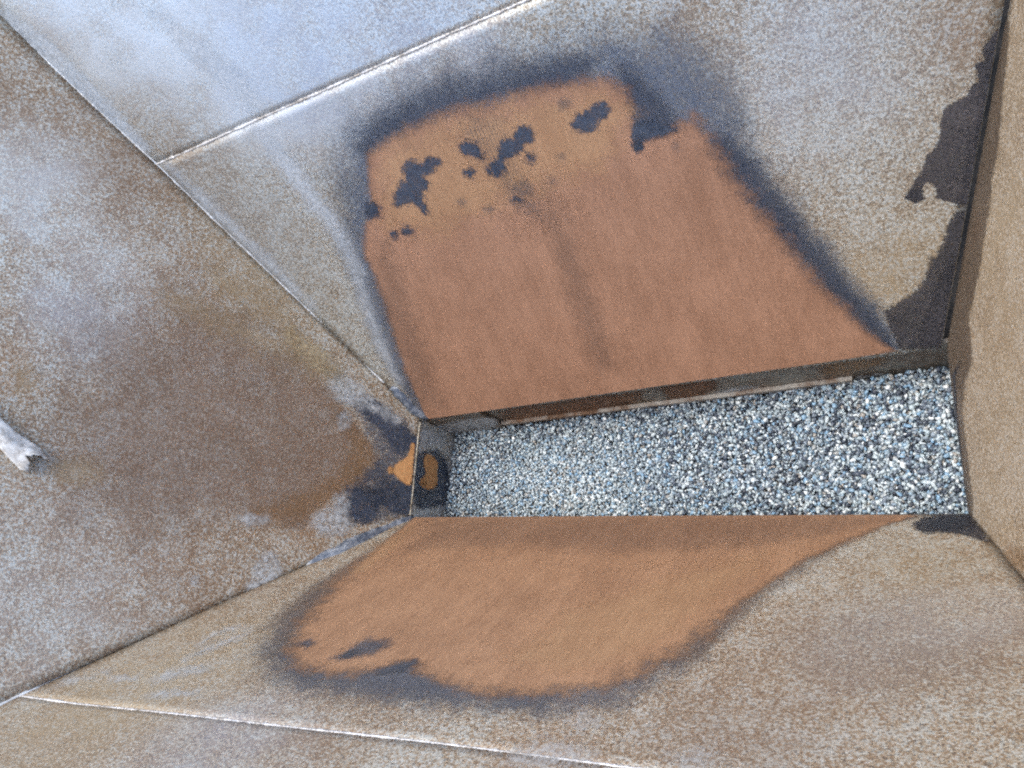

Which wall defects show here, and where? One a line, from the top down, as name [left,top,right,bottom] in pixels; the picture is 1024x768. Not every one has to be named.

water stain [5,11,148,150]
corrosion [364,76,892,420]
water stain [253,22,1009,542]
corrosion [388,443,438,489]
efflorescence [247,552,281,590]
water stain [264,591,707,713]
corrosion [284,515,914,697]